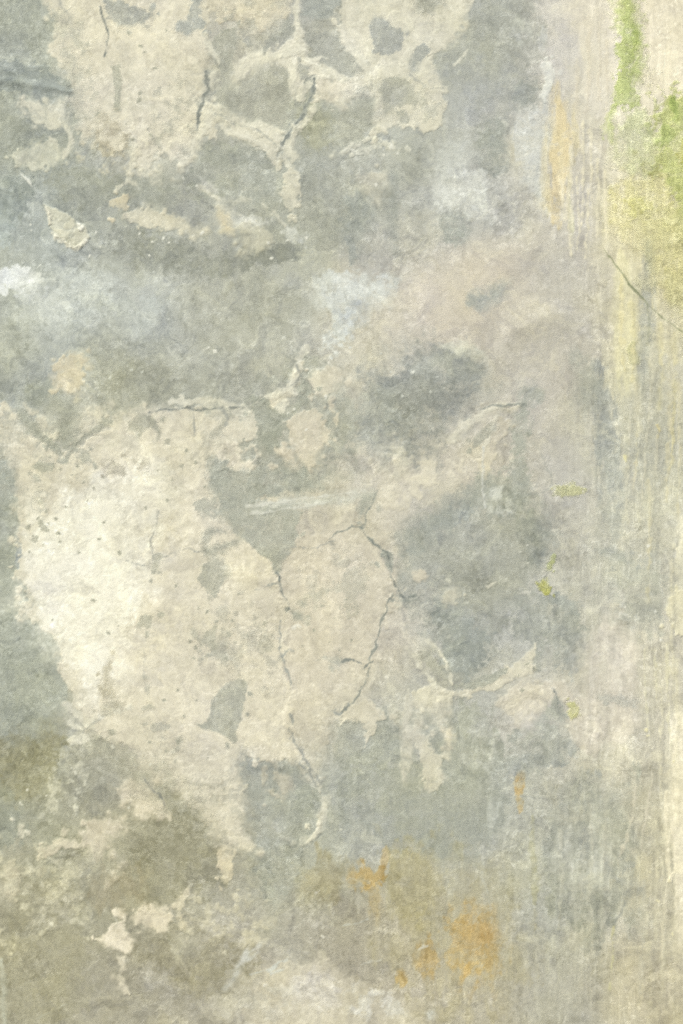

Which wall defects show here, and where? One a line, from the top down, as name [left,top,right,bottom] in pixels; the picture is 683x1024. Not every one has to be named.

crack [193,68,318,169]
crack [603,248,683,346]
crack [147,404,248,437]
crack [253,570,295,687]
crack [290,489,426,717]
rust [285,834,516,1006]